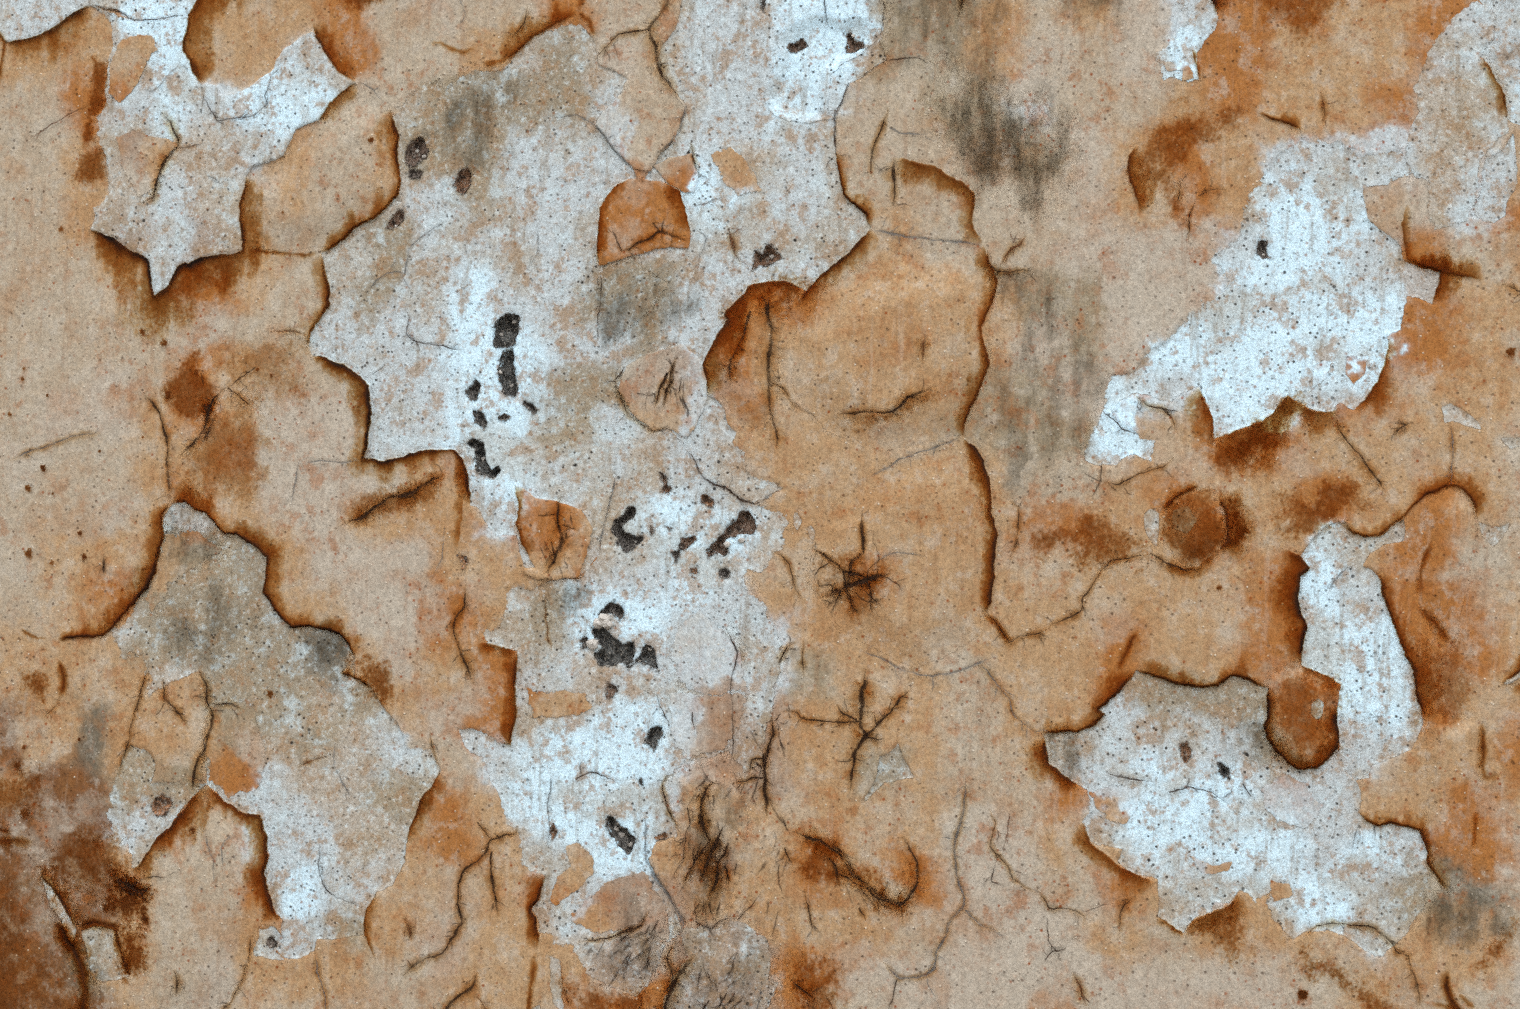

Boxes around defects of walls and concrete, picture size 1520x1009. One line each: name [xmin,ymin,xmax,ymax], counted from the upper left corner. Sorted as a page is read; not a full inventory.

flaking render [0,0,356,295]
flaking render [1084,0,1520,466]
corrosion [0,745,40,818]
corrosion [23,671,46,703]
corrosion [102,862,155,981]
flaking render [105,502,441,960]
flaking render [309,0,886,1009]
crack [778,518,913,670]
crack [583,553,1193,1009]
crack [1002,502,1022,552]
crack [1107,772,1254,802]
flaking render [1044,520,1431,956]